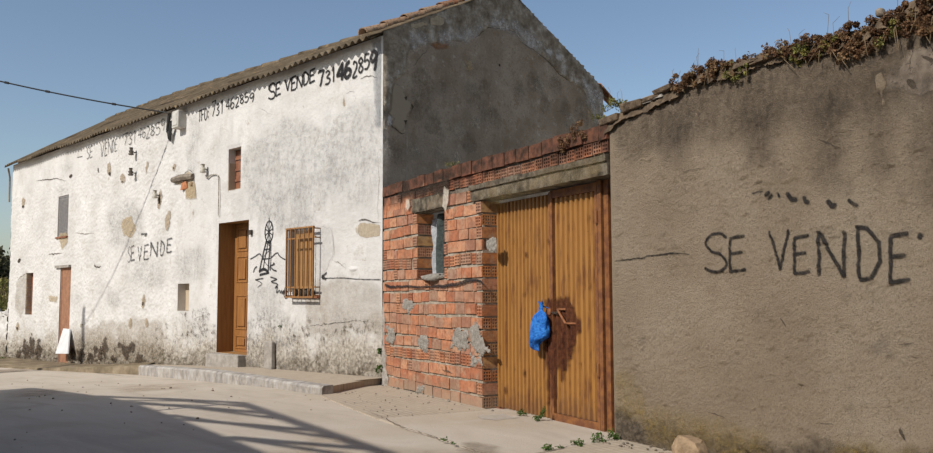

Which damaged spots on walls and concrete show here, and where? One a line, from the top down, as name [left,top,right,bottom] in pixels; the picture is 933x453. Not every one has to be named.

flaking render [383,0,604,139]
flaking render [170,164,196,198]
peeling [356,219,380,238]
leakage [615,411,681,451]